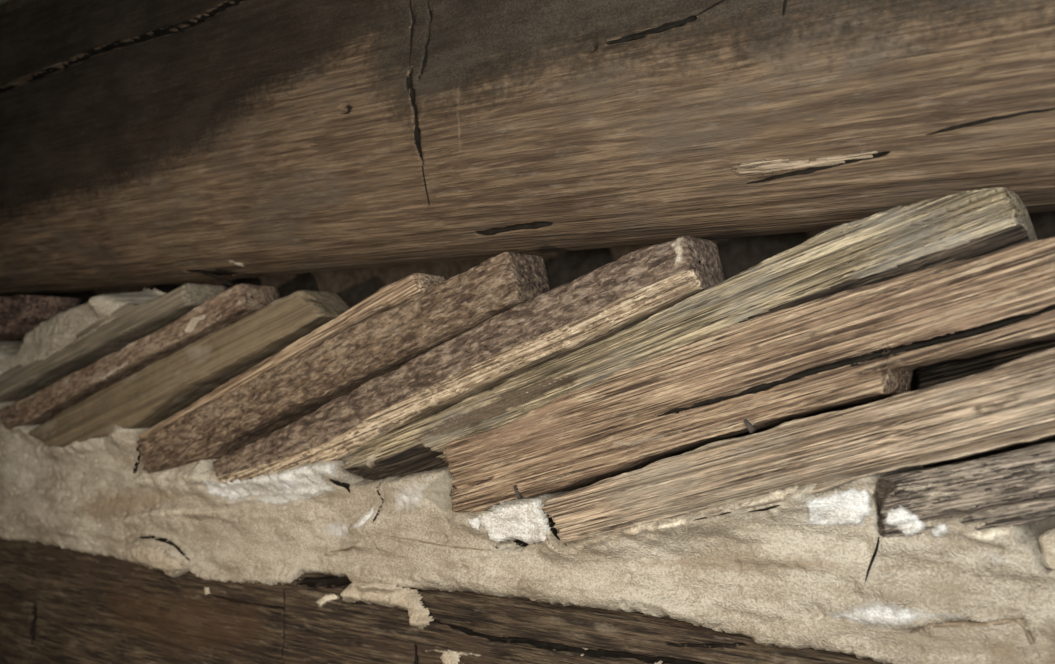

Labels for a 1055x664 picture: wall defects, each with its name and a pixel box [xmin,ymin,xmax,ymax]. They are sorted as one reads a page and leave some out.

crack [606,0,725,44]
crack [0,0,246,93]
crack [406,0,432,203]
crack [926,108,1055,135]
crack [139,535,190,561]
crack [865,535,881,582]